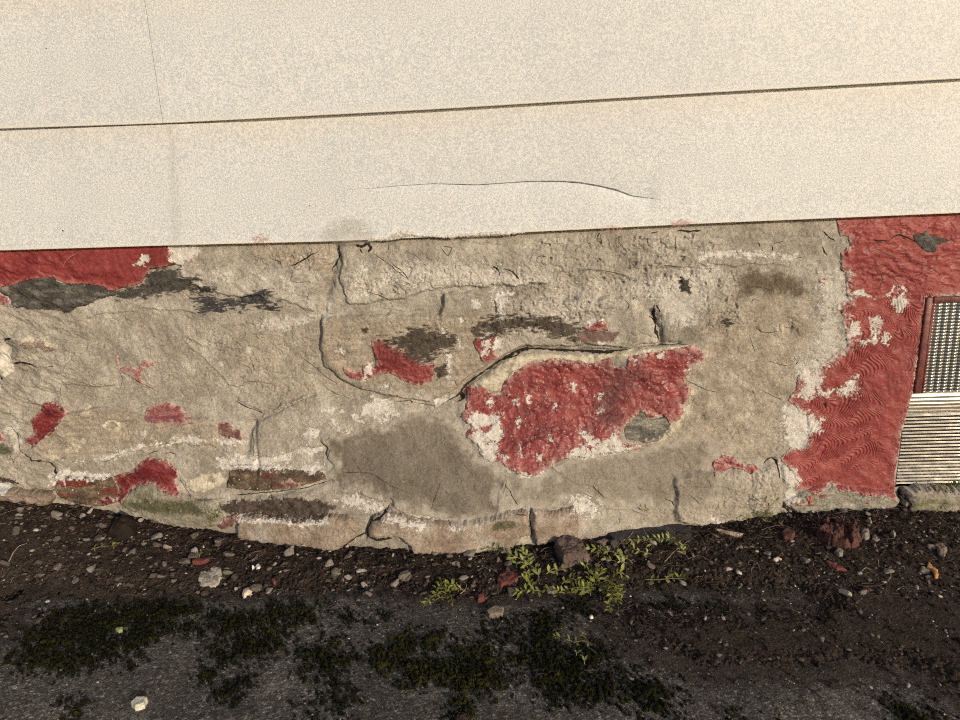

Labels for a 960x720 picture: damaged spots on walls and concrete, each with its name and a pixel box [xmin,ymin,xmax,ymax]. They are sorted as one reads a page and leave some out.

peeling [0,246,174,313]
water stain [114,245,334,332]
crack [587,233,635,274]
peeling [0,338,54,390]
peeling [343,338,435,386]
crack [397,301,693,406]
crack [750,326,798,366]
peeling [780,213,960,509]
peeling [24,401,68,447]
peeling [144,402,194,426]
peeling [461,334,705,476]
peeling [100,458,226,505]